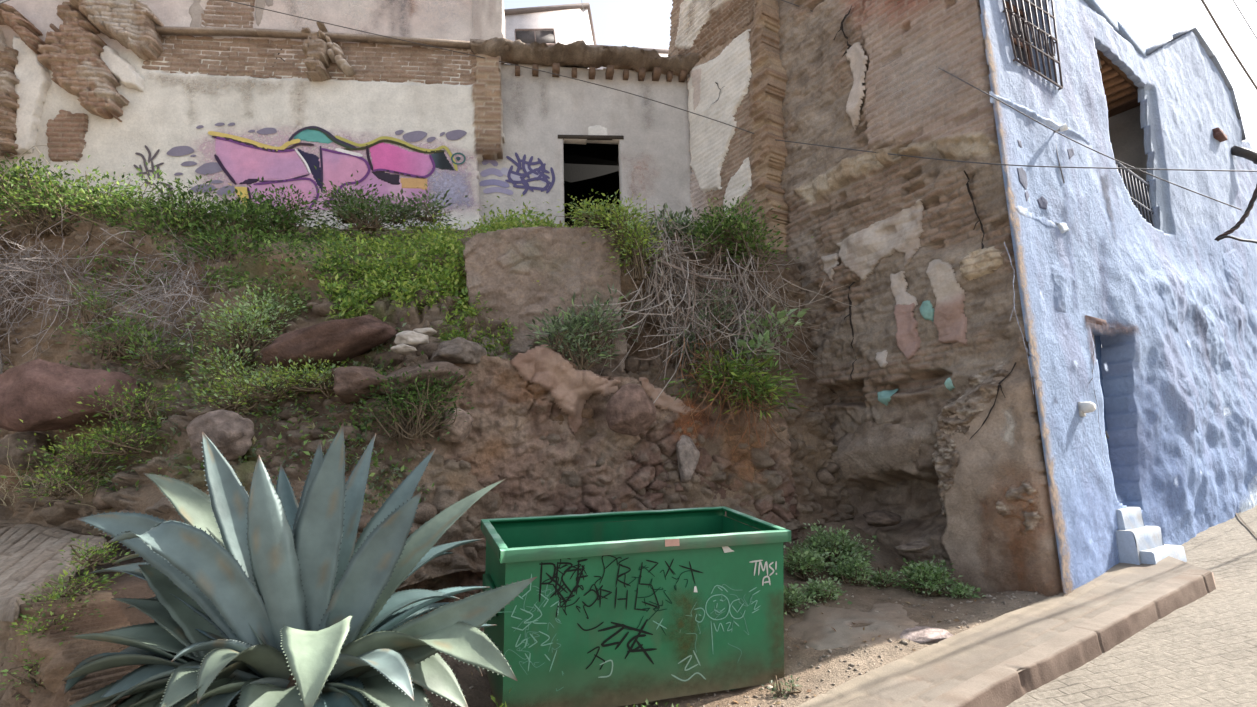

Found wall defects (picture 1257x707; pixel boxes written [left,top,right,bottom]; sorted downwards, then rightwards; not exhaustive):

spalling [0,0,310,162]
spalling [326,41,477,85]
flaking render [678,0,757,217]
crack [964,170,1035,439]